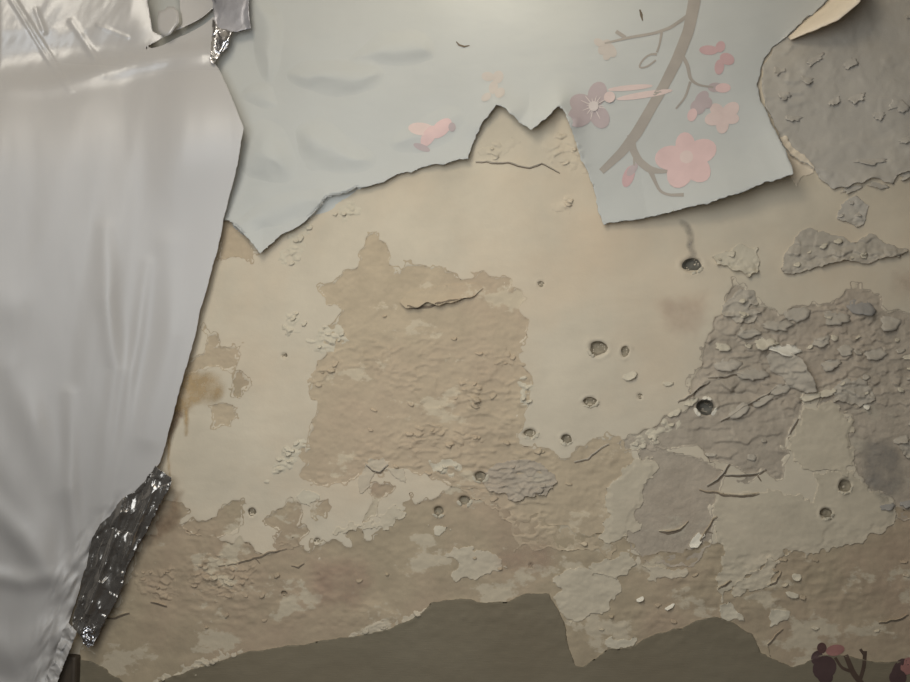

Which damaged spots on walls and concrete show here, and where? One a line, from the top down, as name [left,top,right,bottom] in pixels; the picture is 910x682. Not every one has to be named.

flaking render [216,220,260,264]
peeling [761,0,910,274]
flaking render [80,231,910,682]